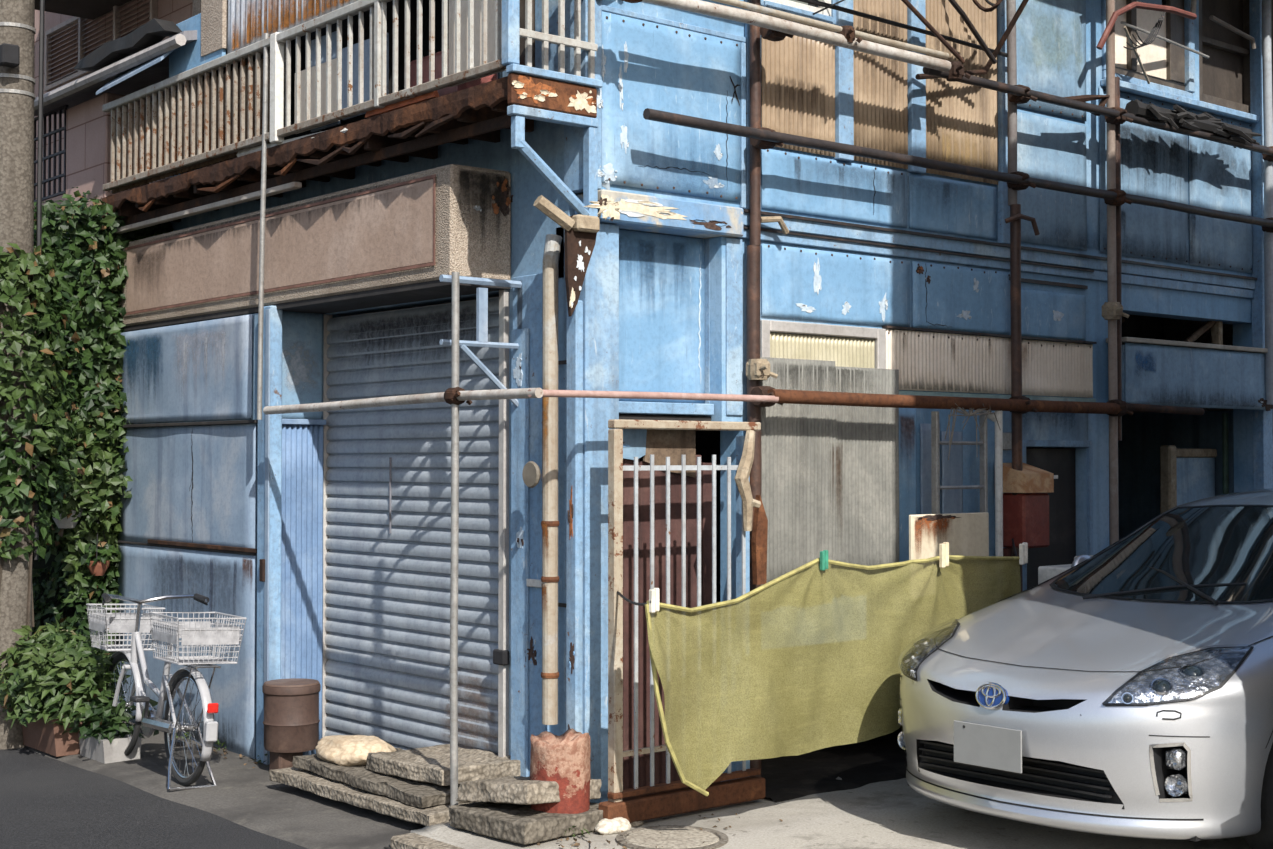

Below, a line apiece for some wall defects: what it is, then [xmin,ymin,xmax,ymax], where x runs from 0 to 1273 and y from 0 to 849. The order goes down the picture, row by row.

corrosion [232,0,350,50]
peeling [512,41,629,154]
corrosion [120,103,263,179]
water stain [460,171,507,235]
corrosion [492,176,513,216]
peeling [584,163,731,230]
peeling [569,240,591,308]
water stain [123,337,161,382]
corrosion [915,518,949,548]